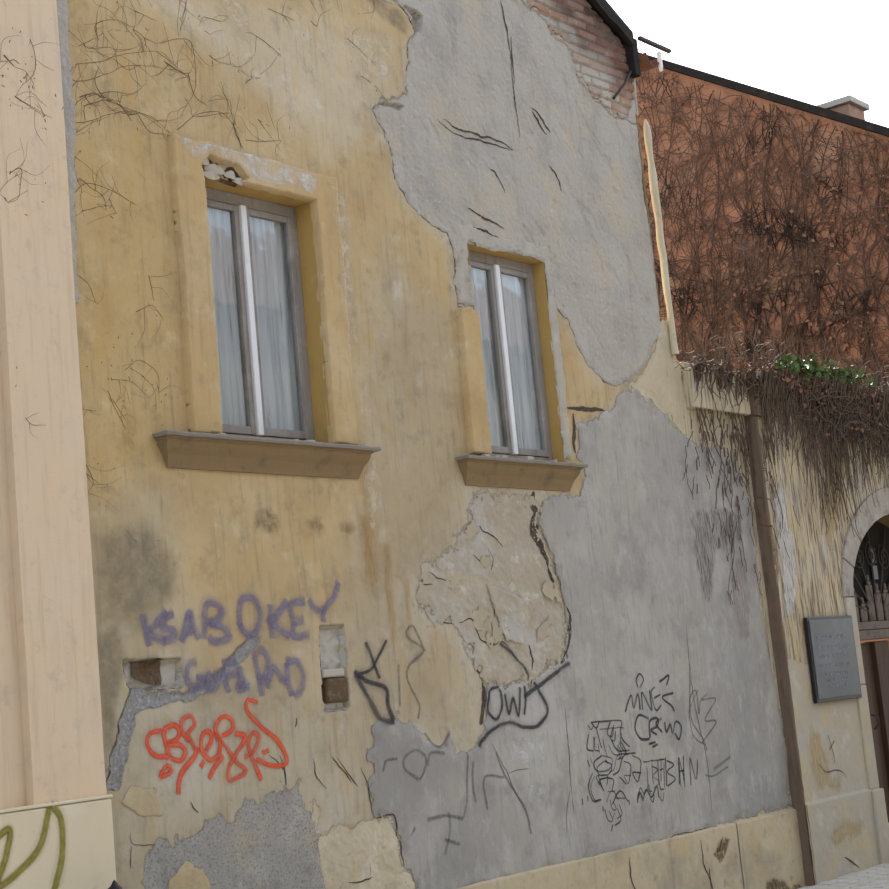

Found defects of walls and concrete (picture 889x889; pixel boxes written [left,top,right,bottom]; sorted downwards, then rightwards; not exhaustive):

spalling [202,158,243,187]
spalling [372,0,686,435]
peeling [416,489,569,691]
peeling [106,633,262,790]
peeling [141,778,416,889]